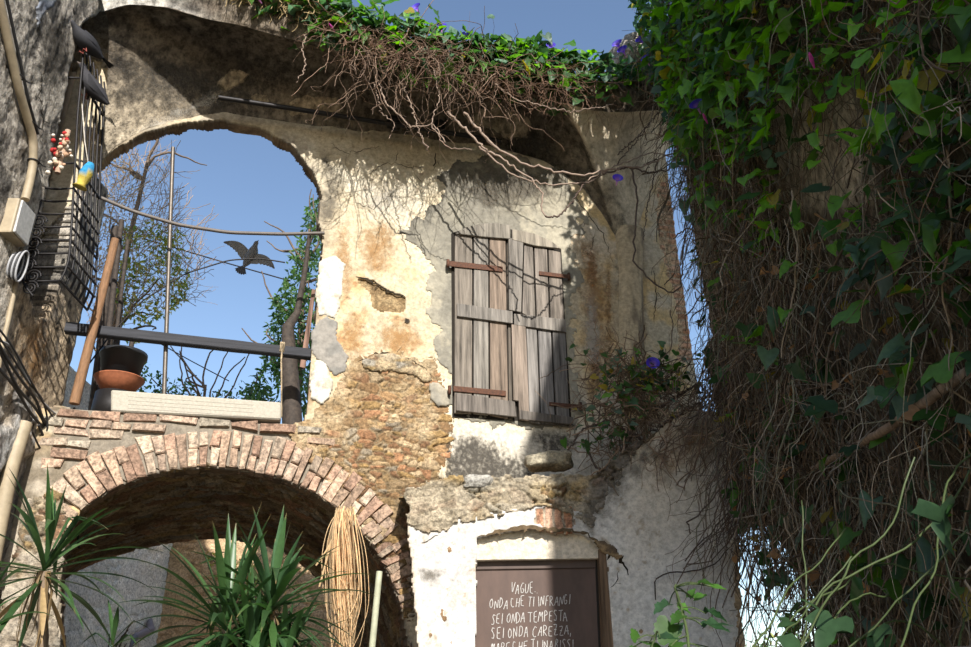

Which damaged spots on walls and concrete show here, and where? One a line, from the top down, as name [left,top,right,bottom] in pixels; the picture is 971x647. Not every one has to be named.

crack [332,143,440,213]
rust [367,226,391,268]
peeling [315,256,346,319]
spalling [358,279,410,324]
spalling [362,353,432,382]
spalling [404,440,643,536]
spalling [595,540,623,560]